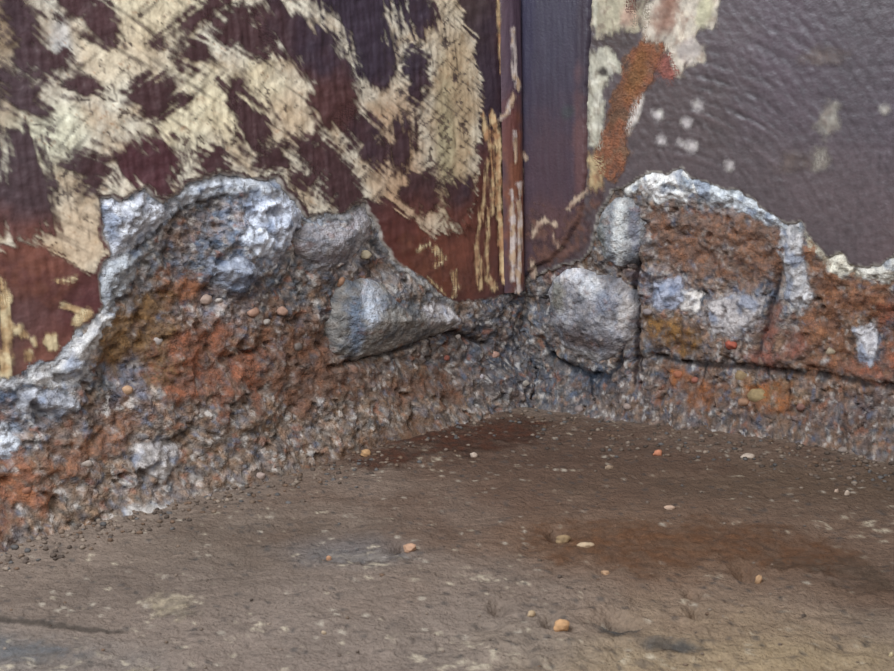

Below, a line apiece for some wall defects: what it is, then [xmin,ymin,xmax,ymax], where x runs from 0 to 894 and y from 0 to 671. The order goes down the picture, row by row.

rust [526,35,679,269]
peeling [566,0,720,210]
rust [91,270,362,418]
spalling [0,0,537,552]
spalling [519,168,894,463]
crack [543,257,894,407]
rust [752,245,894,379]